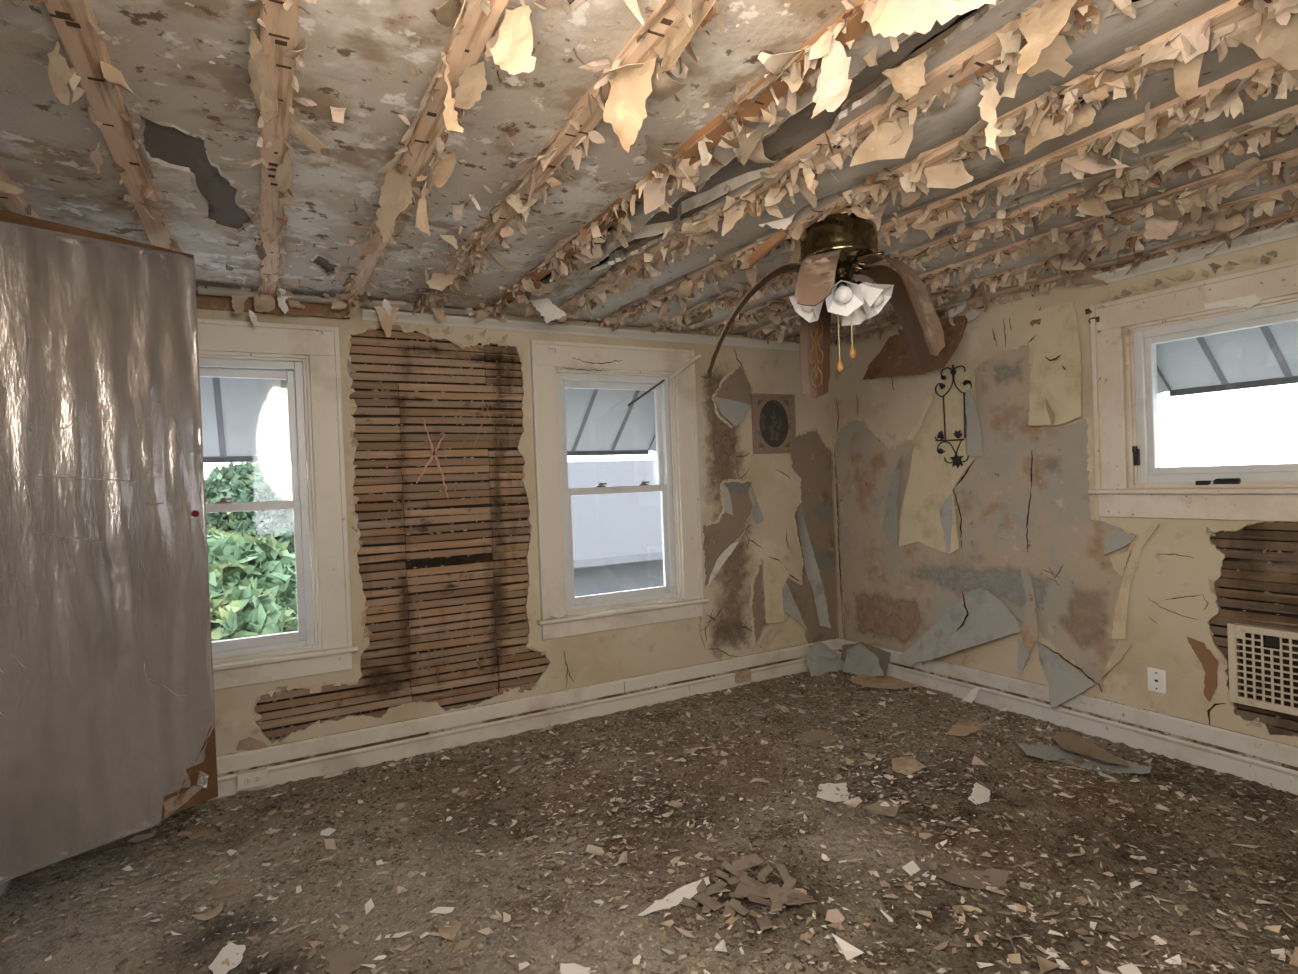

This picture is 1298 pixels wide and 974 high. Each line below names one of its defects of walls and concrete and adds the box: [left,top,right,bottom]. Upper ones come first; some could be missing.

peeling [0,180,31,215]
flaking render [47,0,1298,743]
peeling [892,756,927,775]